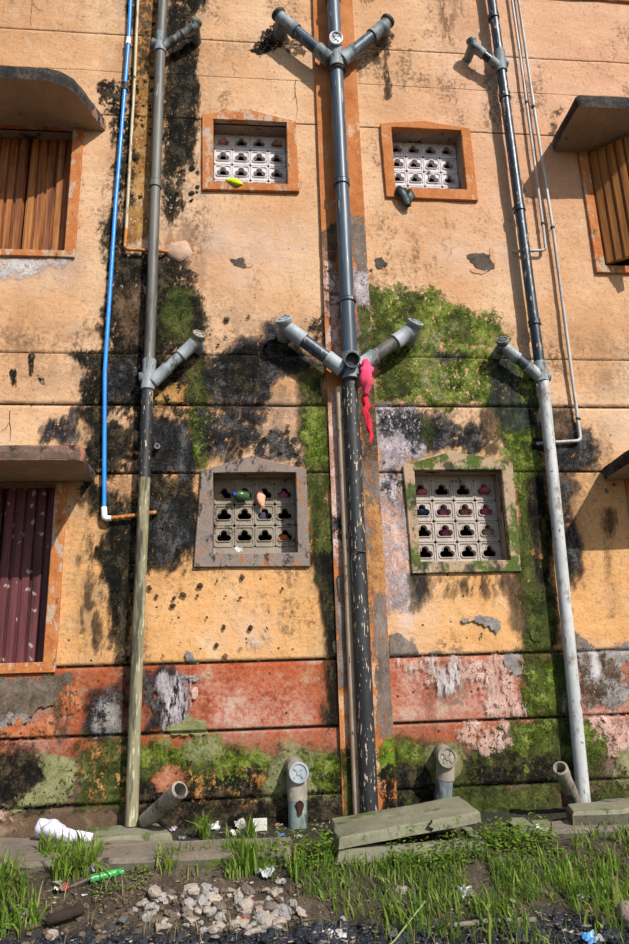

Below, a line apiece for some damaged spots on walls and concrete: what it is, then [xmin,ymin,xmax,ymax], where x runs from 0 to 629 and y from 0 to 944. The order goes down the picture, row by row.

leakage [161,0,206,224]
leakage [249,23,306,57]
spalling [230,257,253,268]
spalling [466,248,496,274]
leakage [38,63,339,742]
peeling [358,383,527,757]
leakage [375,355,555,641]
leakage [552,405,602,588]
spalling [0,671,89,814]
spalling [180,651,202,699]
leakage [138,762,288,830]
peeling [574,631,629,789]